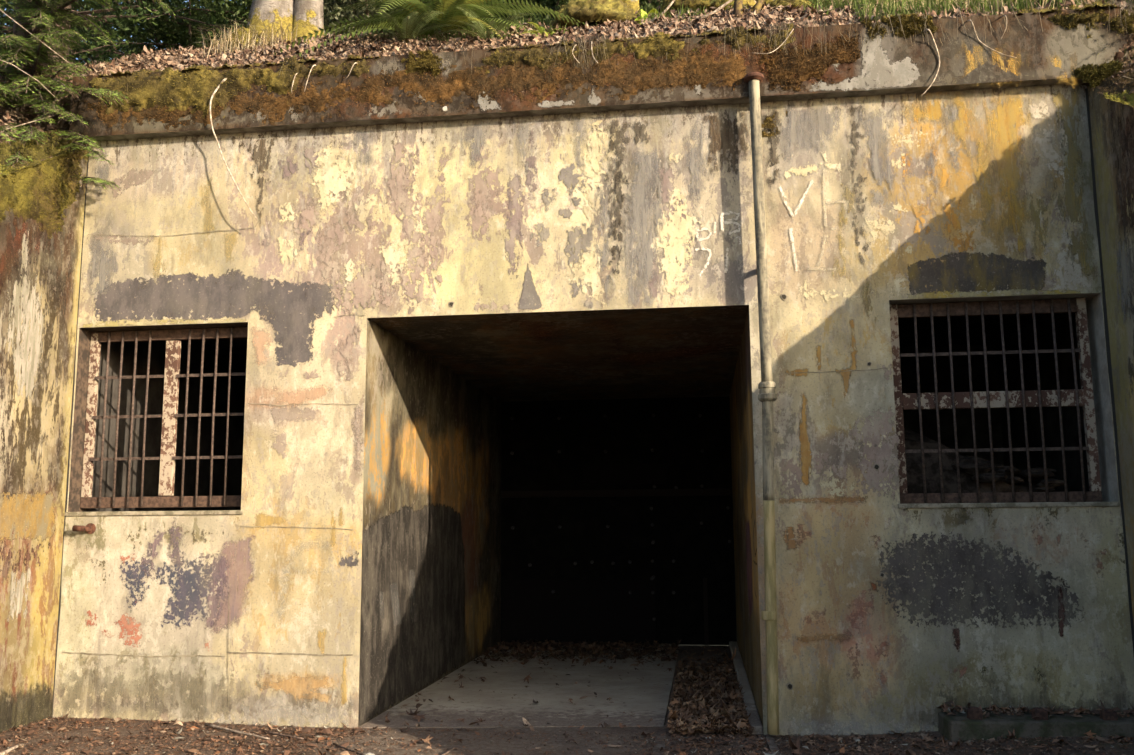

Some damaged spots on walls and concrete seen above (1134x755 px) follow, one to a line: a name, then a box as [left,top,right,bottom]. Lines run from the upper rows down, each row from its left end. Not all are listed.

spalling [376,59,402,74]
peeling [648,148,704,306]
peeling [259,88,609,458]
leakage [256,513,285,528]
leakage [0,677,83,734]
leakage [135,673,262,724]